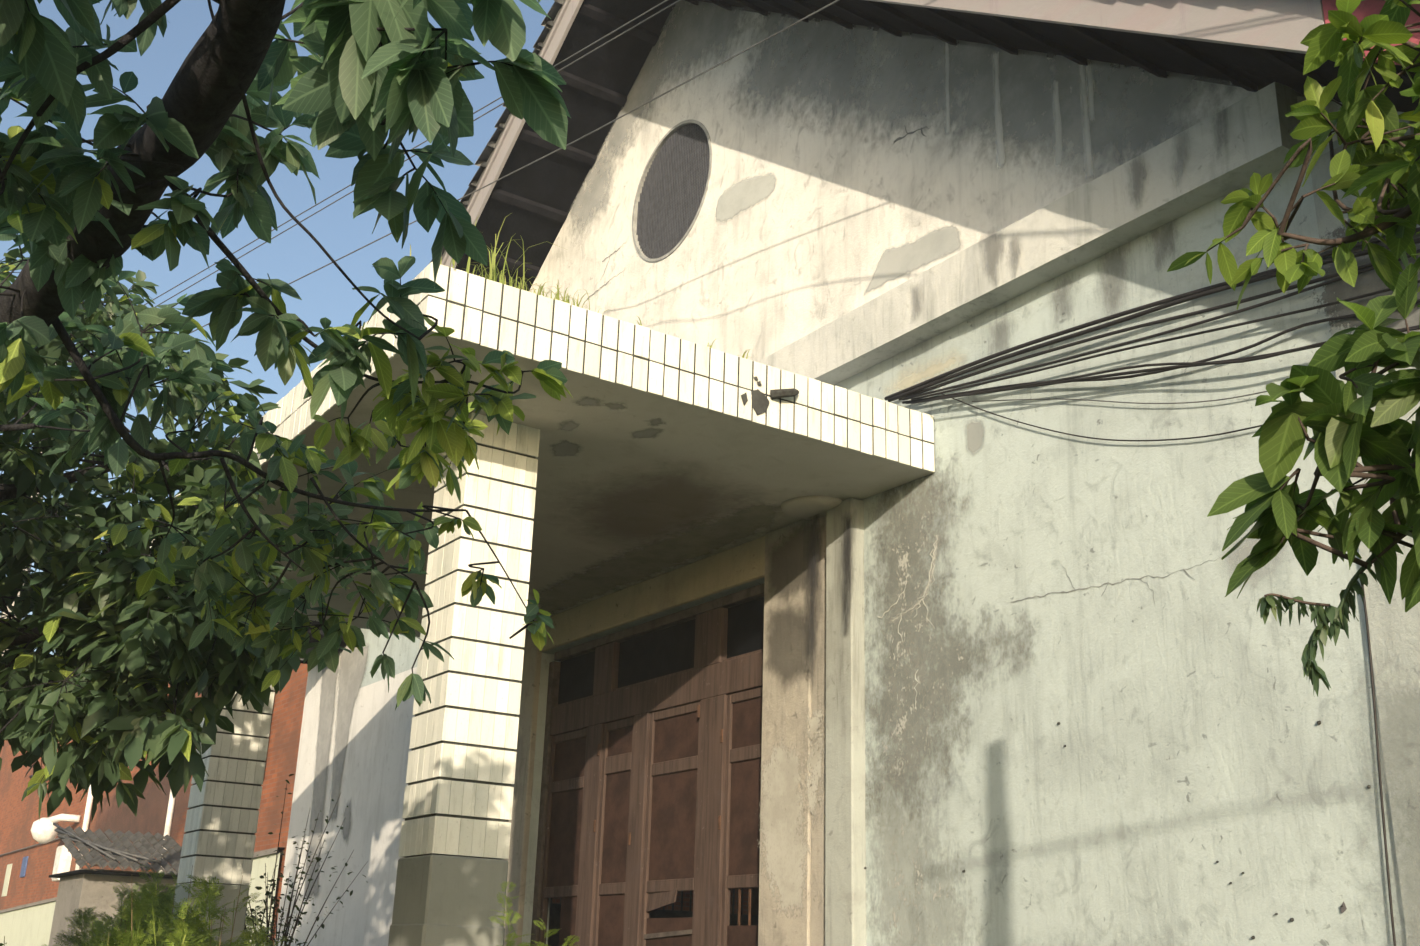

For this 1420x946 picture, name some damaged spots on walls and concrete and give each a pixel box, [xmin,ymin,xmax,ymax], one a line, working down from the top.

water stain [994,54,1004,166]
spalling [741,376,799,415]
water stain [769,516,819,683]
water stain [842,516,852,633]
water stain [866,475,1027,806]
crack [1011,553,1236,603]